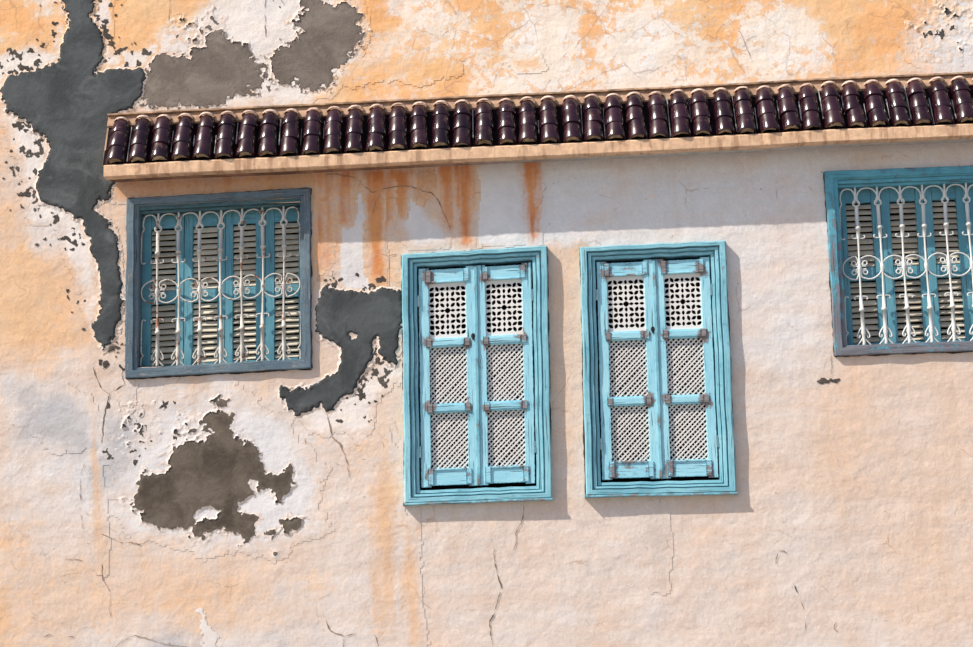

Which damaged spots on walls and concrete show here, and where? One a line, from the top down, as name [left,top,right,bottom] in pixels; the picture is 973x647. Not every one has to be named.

peeling [0,1,68,88]
flaking render [90,0,374,112]
flaking render [894,0,973,74]
peeling [0,101,102,334]
rust [108,165,481,288]
peeling [324,193,387,292]
rust [514,162,547,247]
flaking render [102,348,403,564]
crack [327,415,350,478]
crack [489,507,524,644]